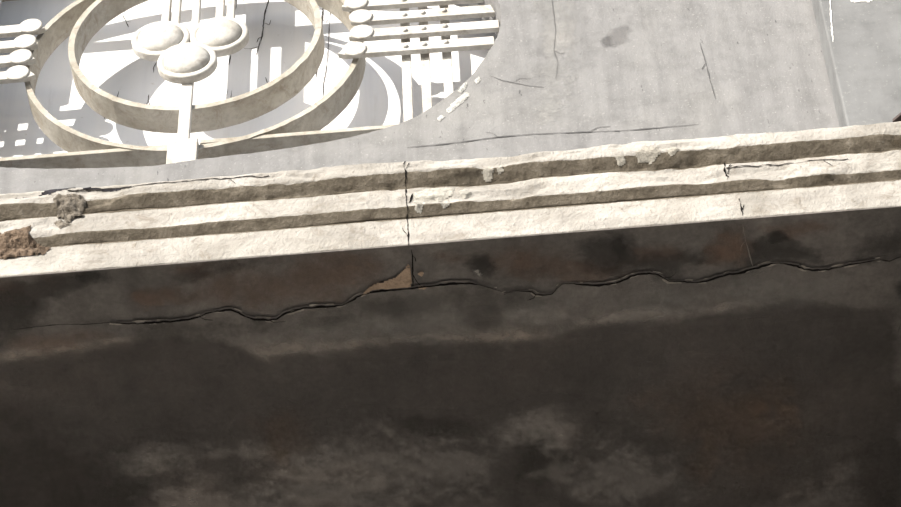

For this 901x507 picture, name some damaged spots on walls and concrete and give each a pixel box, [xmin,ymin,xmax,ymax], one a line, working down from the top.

crack [229,0,271,63]
spalling [0,225,51,260]
spalling [39,186,131,228]
crack [13,124,900,330]
peeling [361,264,427,295]
leakage [0,303,901,507]